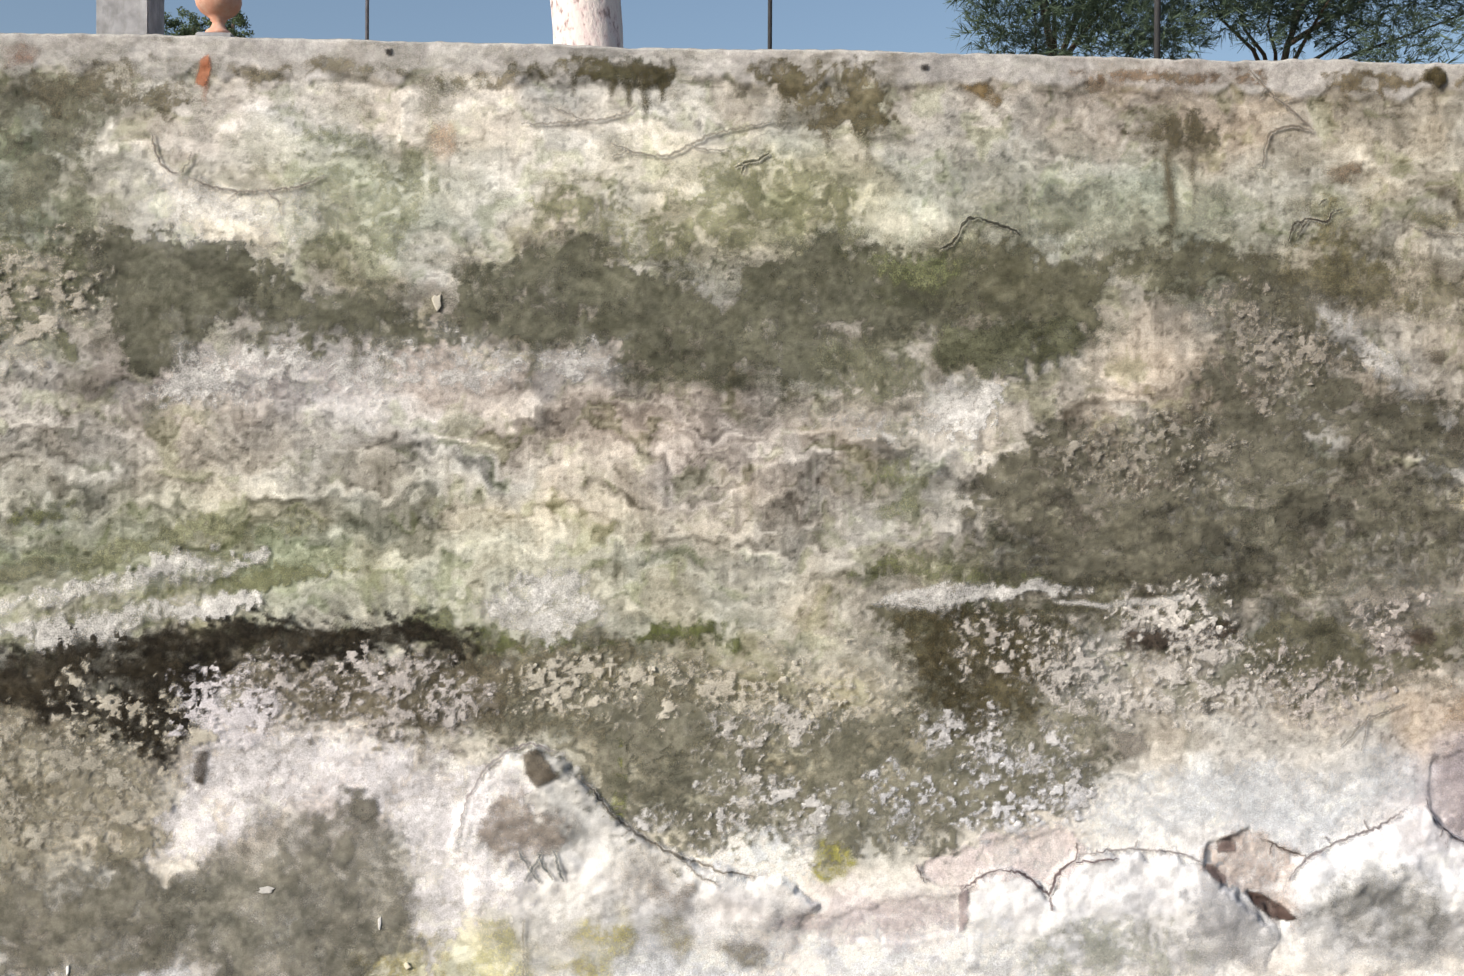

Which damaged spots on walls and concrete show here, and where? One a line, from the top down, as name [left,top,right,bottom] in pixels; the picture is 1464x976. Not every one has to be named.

corrosion [195,55,211,89]
leakage [230,49,411,92]
leakage [428,53,677,119]
crack [939,216,1020,250]
crack [1287,199,1343,241]
leakage [1430,352,1446,364]
leakage [796,683,827,705]
peeling [0,575,1437,938]
crack [458,742,754,886]
leakage [980,814,1006,830]
crack [1260,798,1464,881]
crack [916,840,1205,911]